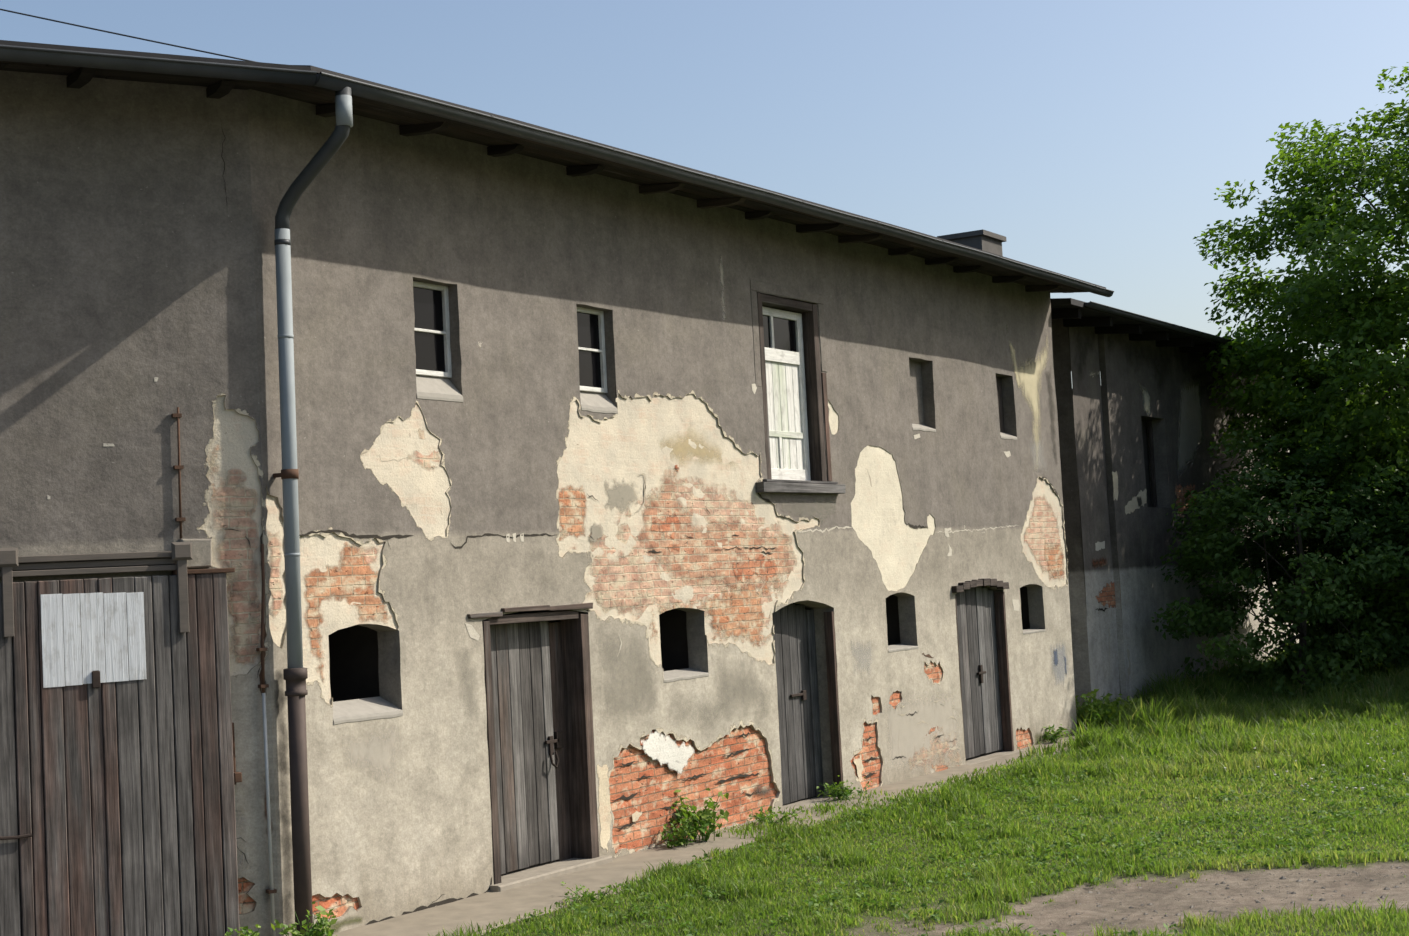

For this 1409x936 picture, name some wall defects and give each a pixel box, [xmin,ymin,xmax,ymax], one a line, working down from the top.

peeling [196,393,399,707]
crack [299,530,414,547]
peeling [360,401,452,541]
peeling [556,390,820,671]
peeling [851,445,985,591]
peeling [1020,477,1068,590]
spalling [1095,581,1122,612]
spalling [597,720,780,858]
spalling [237,817,257,915]
spalling [312,893,362,919]